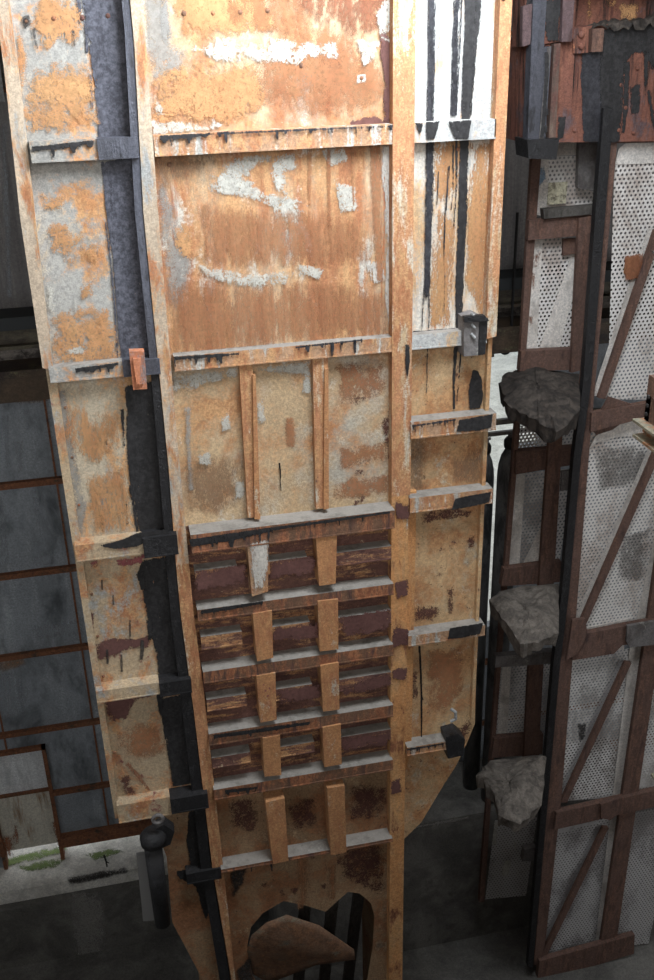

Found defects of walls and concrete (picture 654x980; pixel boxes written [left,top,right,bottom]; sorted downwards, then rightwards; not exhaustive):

corrosion [30,0,82,50]
corrosion [607,0,638,20]
corrosion [17,34,99,133]
corrosion [152,0,386,126]
peeling [322,148,348,166]
peeling [208,153,304,227]
corrosion [175,145,382,281]
peeling [336,183,357,212]
corrosion [171,281,385,351]
corrosion [336,363,386,405]
corrosion [285,418,295,447]
corrosion [334,443,388,499]